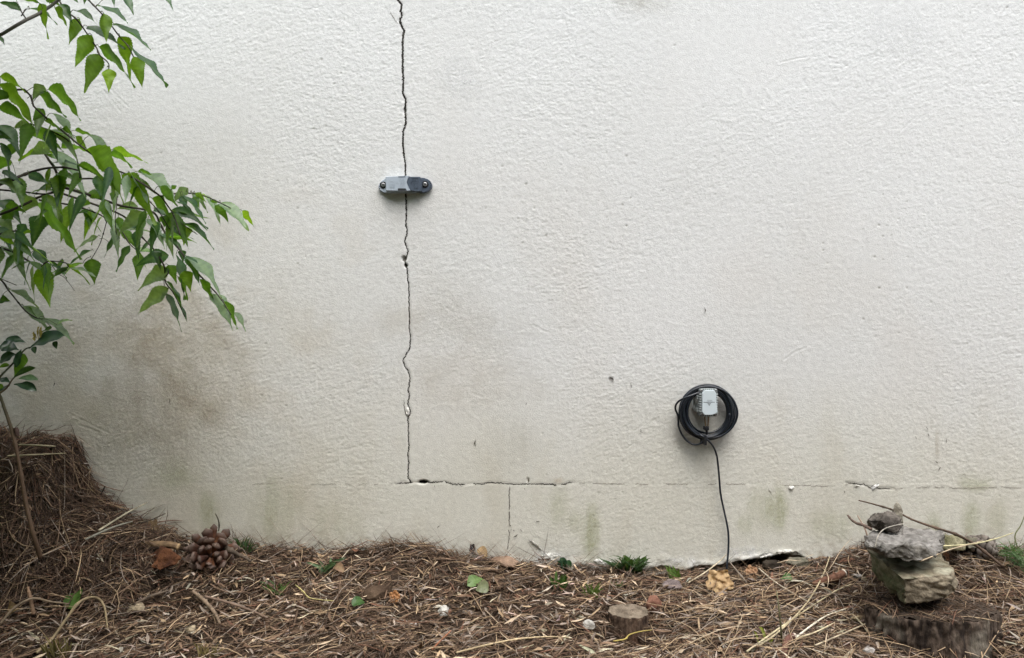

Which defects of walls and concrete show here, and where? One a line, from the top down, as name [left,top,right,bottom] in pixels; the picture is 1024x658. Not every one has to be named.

crack [313,0,745,549]